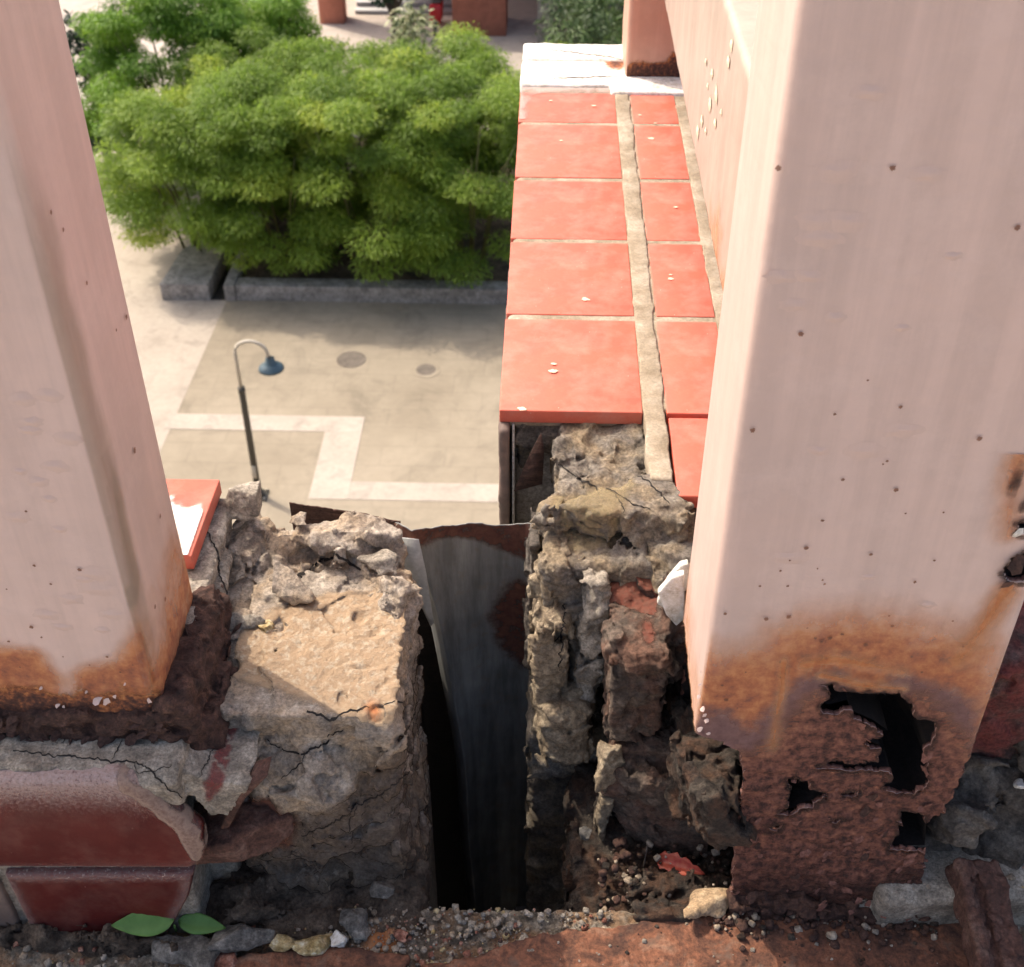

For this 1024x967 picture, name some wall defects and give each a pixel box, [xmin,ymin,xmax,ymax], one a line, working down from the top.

rust [605,52,680,77]
crack [558,464,669,513]
rust [1008,454,1024,491]
rust [394,523,530,560]
rust [0,551,242,751]
spalling [231,589,406,727]
rust [489,579,527,665]
spalling [609,559,689,643]
crack [13,739,182,798]
crack [267,700,404,779]
peeling [697,669,711,735]
rust [696,502,1024,925]